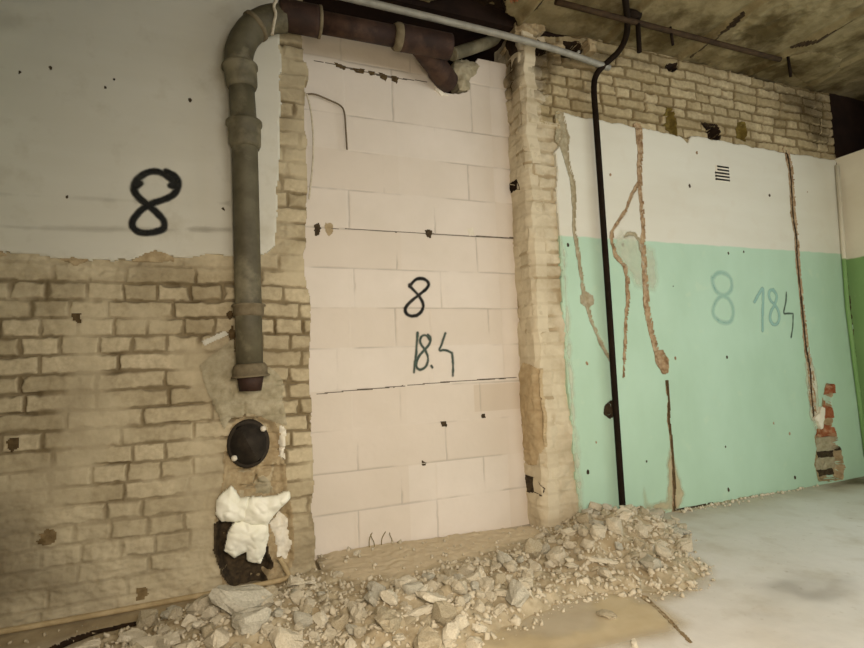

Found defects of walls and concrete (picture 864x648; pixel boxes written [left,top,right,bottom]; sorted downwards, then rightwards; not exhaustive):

peeling [0,33,333,628]
spalling [806,364,846,482]